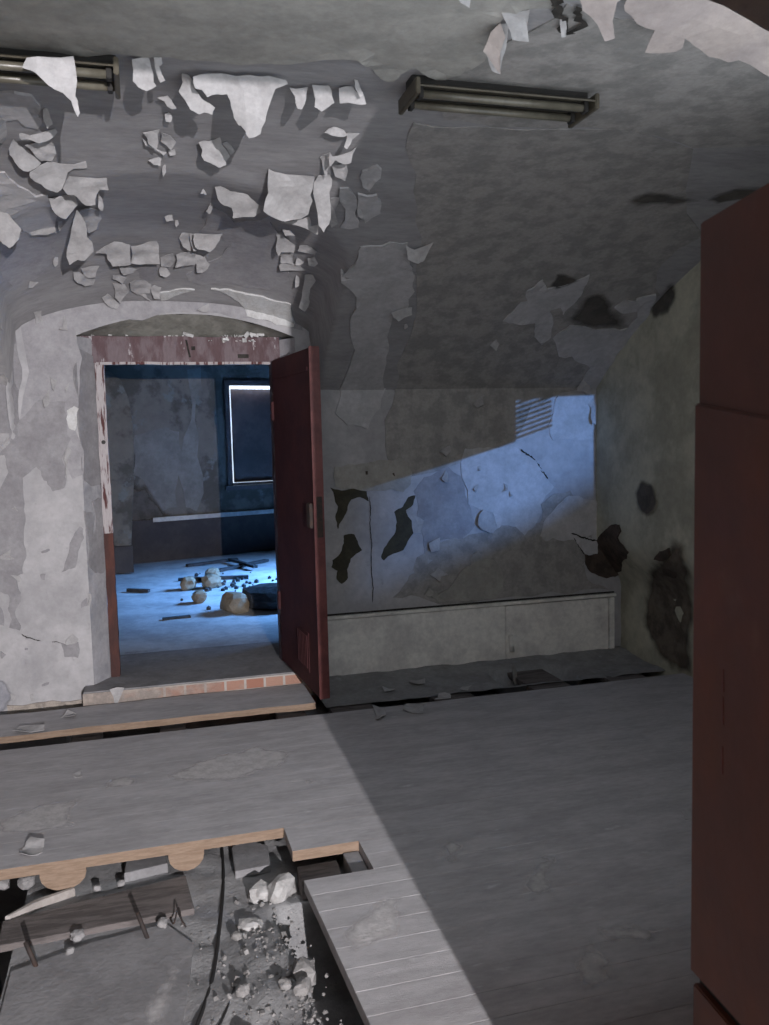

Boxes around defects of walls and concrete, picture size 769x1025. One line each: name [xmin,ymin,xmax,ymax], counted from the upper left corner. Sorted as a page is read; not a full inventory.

peeling [0,0,769,631]
leakage [636,482,656,515]
peeling [61,633,80,658]